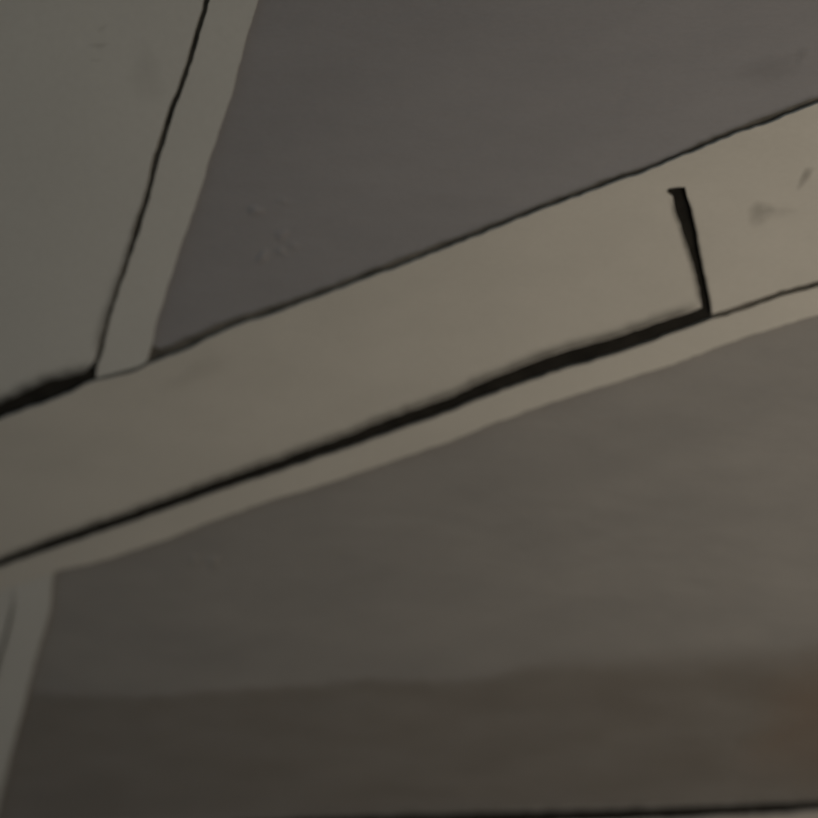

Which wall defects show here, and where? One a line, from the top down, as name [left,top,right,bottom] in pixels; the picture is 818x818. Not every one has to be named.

crack [0,0,818,418]
crack [0,187,818,566]